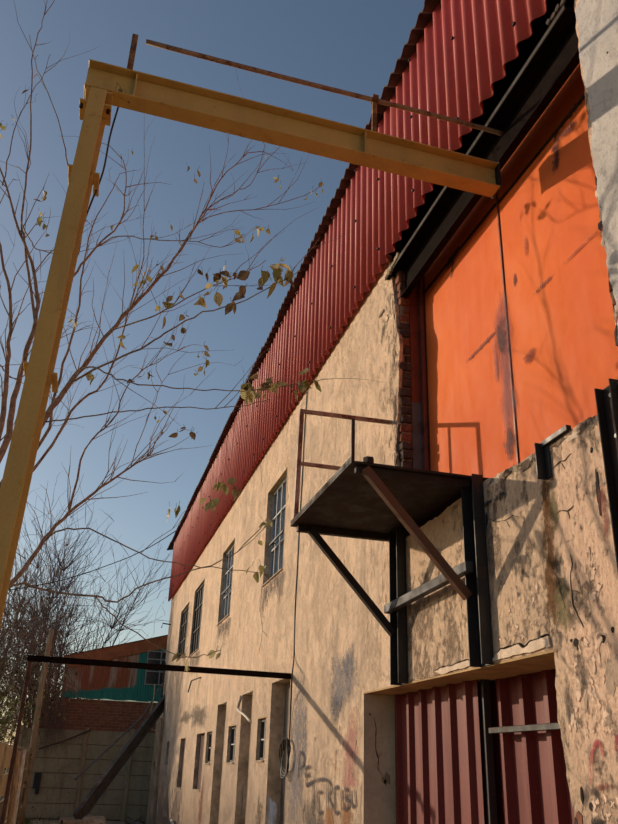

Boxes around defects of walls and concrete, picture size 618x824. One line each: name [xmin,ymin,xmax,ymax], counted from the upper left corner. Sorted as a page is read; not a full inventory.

spalling [379,270,413,468]
crack [553,555,584,627]
spalling [434,659,469,674]
spalling [492,624,552,662]
peeling [565,627,618,738]
peeling [574,786,618,824]